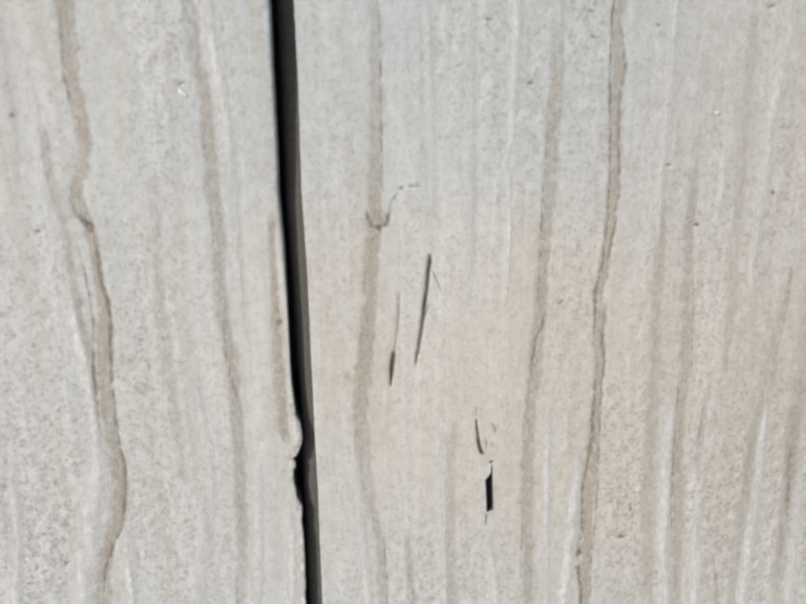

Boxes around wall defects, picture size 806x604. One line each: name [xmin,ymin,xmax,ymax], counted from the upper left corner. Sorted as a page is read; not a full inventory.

crack [415,255,431,364]
crack [388,352,396,385]
crack [475,420,483,454]